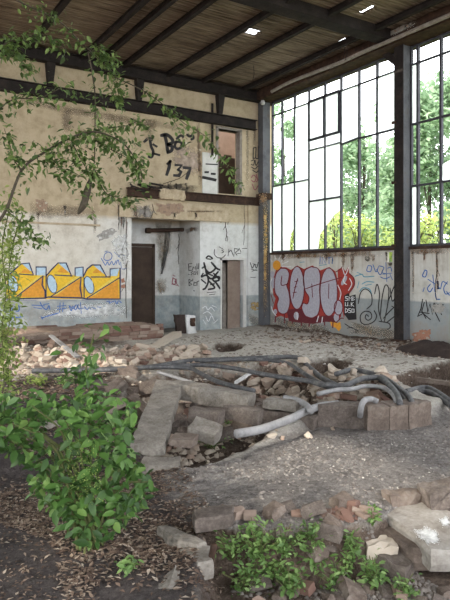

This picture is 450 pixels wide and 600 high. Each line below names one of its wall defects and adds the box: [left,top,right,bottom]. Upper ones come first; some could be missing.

spalling [156,188,186,216]
leakage [159,227,170,266]
rust [260,194,268,290]